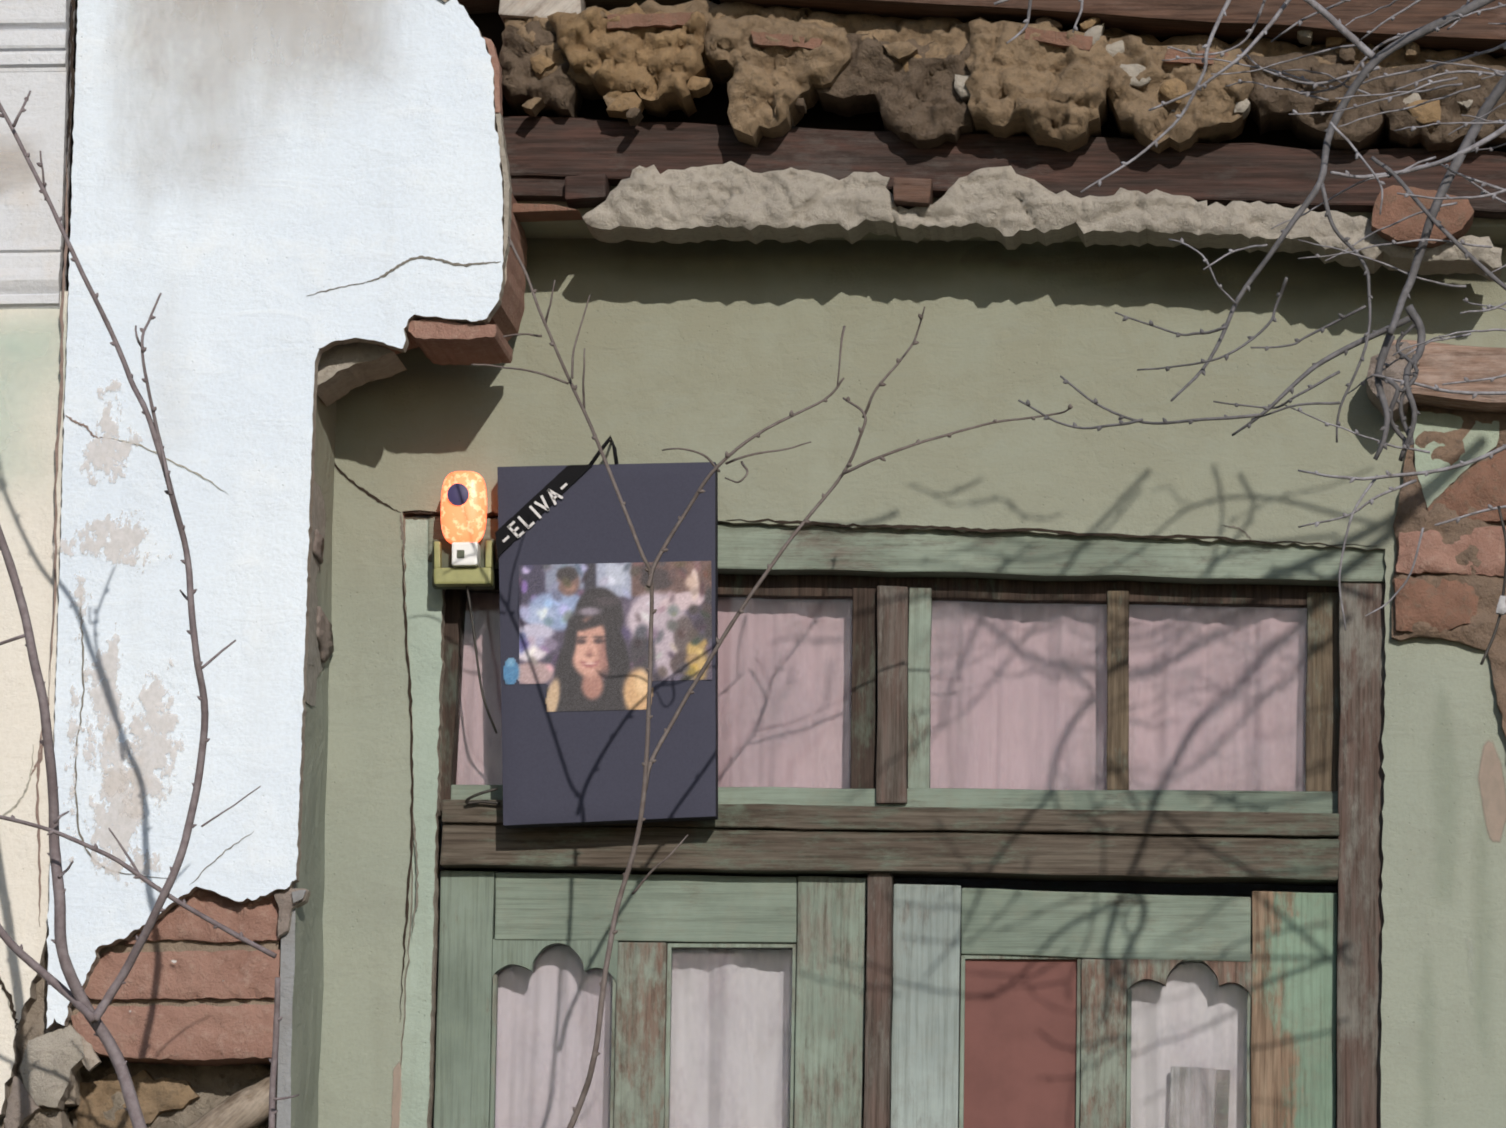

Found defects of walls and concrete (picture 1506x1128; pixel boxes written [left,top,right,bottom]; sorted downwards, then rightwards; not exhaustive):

crack [307,255,501,296]
flaking render [582,161,1502,281]
peeling [80,380,143,485]
crack [2,0,254,925]
peeling [53,510,171,573]
spalling [1366,340,1506,842]
peeling [65,633,184,885]
crack [0,977,18,1031]
flaking render [21,888,311,1128]